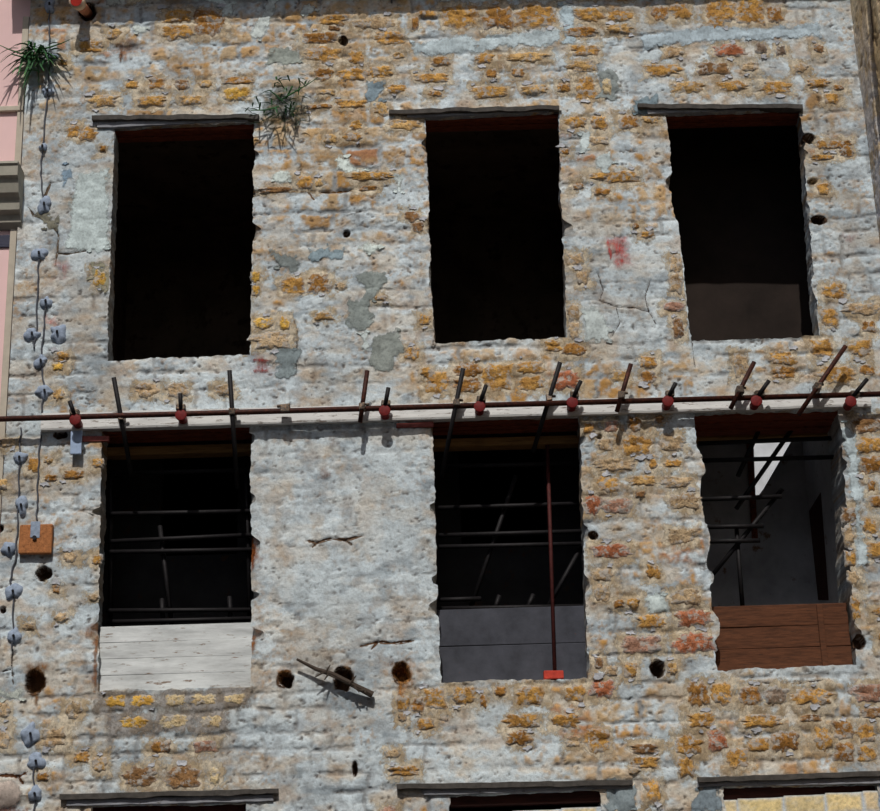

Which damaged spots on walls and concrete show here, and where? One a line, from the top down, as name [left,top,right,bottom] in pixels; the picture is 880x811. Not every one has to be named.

peeling [294,0,859,201]
spalling [256,170,326,197]
spalling [810,215,827,225]
spalling [243,311,299,357]
spalling [250,258,347,325]
spalling [397,247,614,402]
crack [598,275,656,336]
spalling [657,250,689,345]
spalling [763,277,880,390]
spalling [579,414,702,550]
spalling [840,408,880,656]
spalling [391,531,880,811]